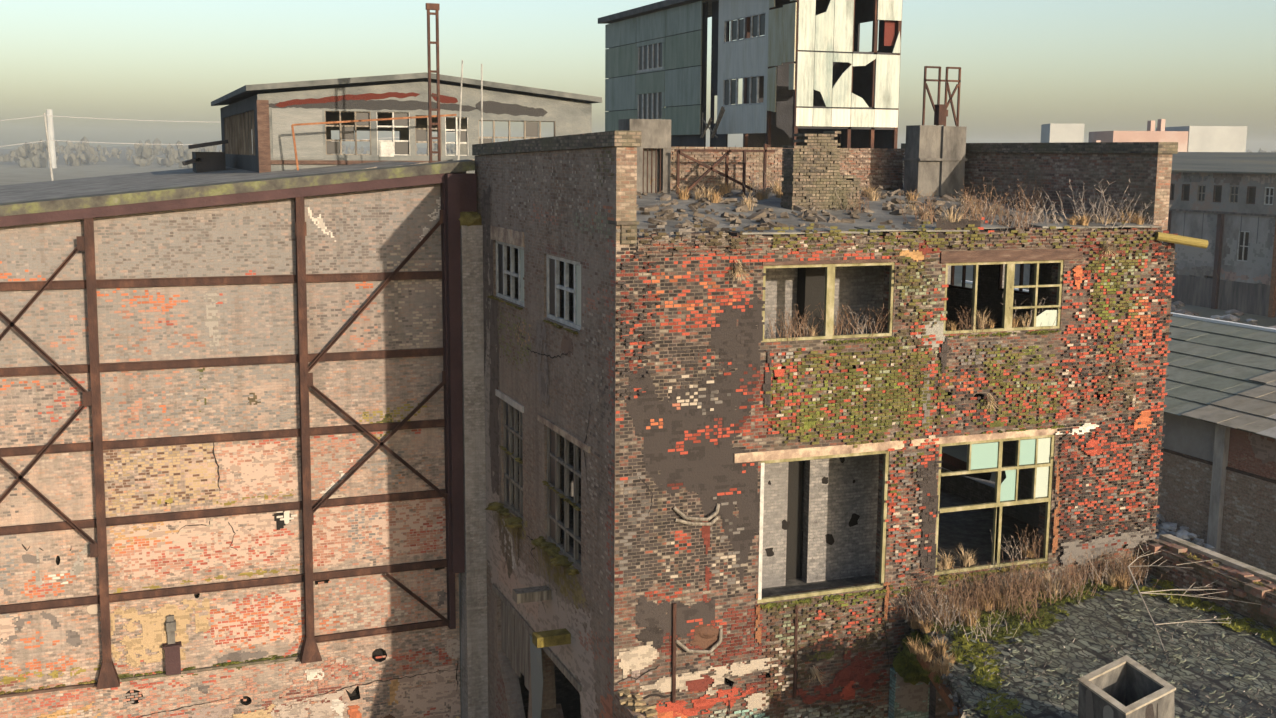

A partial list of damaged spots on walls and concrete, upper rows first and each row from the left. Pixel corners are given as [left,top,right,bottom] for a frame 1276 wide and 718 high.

flaking render [0,379,87,422]
flaking render [100,345,296,582]
spalling [0,432,460,718]
flaking render [505,150,896,642]
spalling [579,601,1084,718]
flaking render [668,231,1276,618]
peeling [1112,584,1249,668]
peeling [1167,656,1274,718]